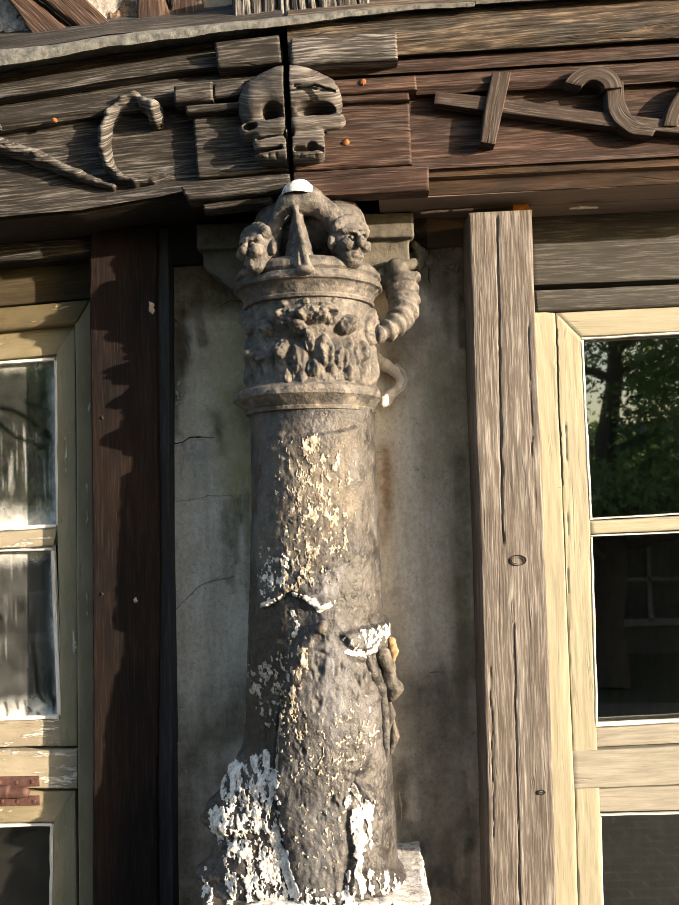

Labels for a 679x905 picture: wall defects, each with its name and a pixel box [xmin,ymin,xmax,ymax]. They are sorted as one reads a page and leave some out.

crack [37,0,71,26]
crack [174,436,214,447]
peeling [257,433,356,613]
spalling [207,610,431,905]
spalling [201,866,214,905]